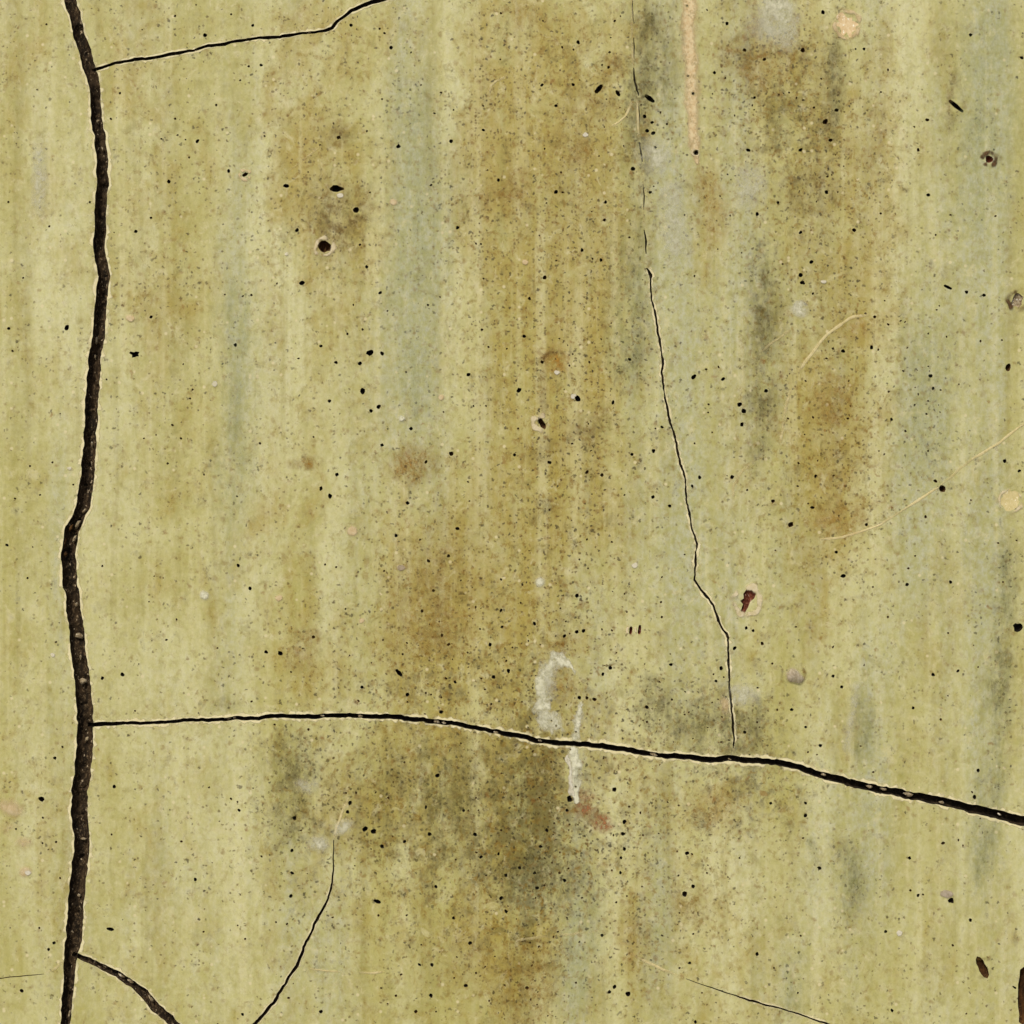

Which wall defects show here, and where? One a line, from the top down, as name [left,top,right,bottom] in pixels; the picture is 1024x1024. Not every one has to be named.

crack [614,0,643,162]
crack [800,315,863,368]
crack [971,423,1024,461]
crack [58,0,392,1024]
crack [646,268,737,748]
crack [824,487,938,540]
leakage [533,651,576,733]
crack [87,710,1024,829]
leakage [565,702,583,804]
crack [642,959,829,1024]